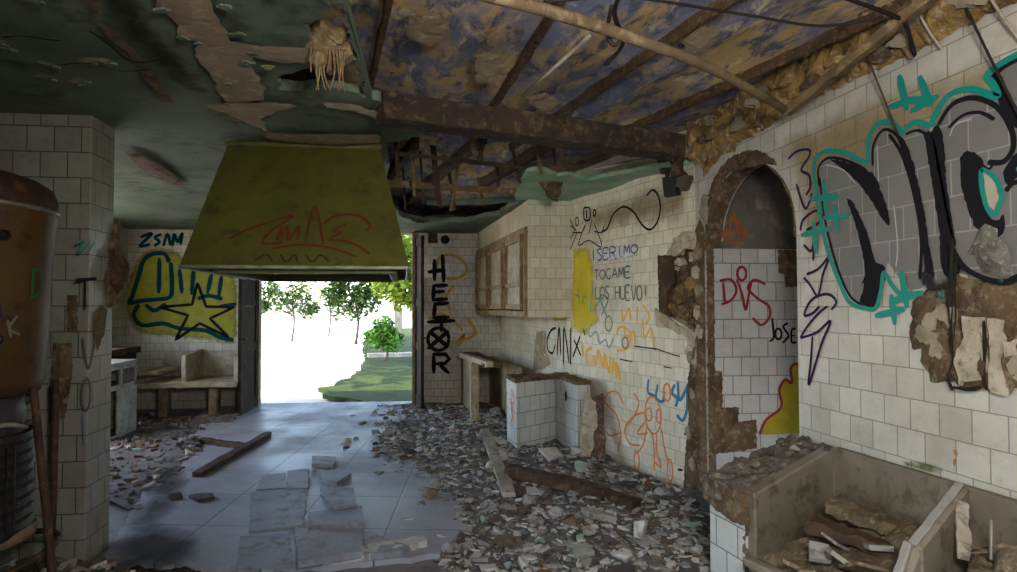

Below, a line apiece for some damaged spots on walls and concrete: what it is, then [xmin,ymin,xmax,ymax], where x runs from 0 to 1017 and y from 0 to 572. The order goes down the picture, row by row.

peeling [153,0,381,146]
spalling [655,0,1017,572]